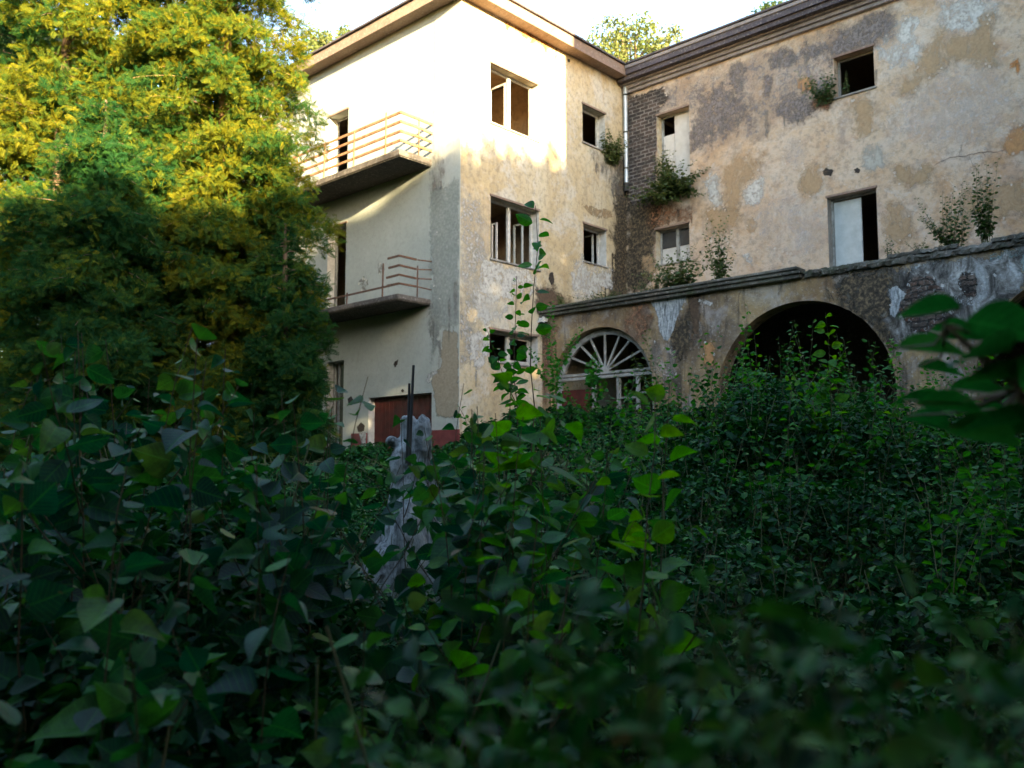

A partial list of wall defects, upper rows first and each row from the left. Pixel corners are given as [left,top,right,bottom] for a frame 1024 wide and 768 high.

leakage [664,9,893,157]
peeling [651,296,713,342]
peeling [827,180,1024,350]